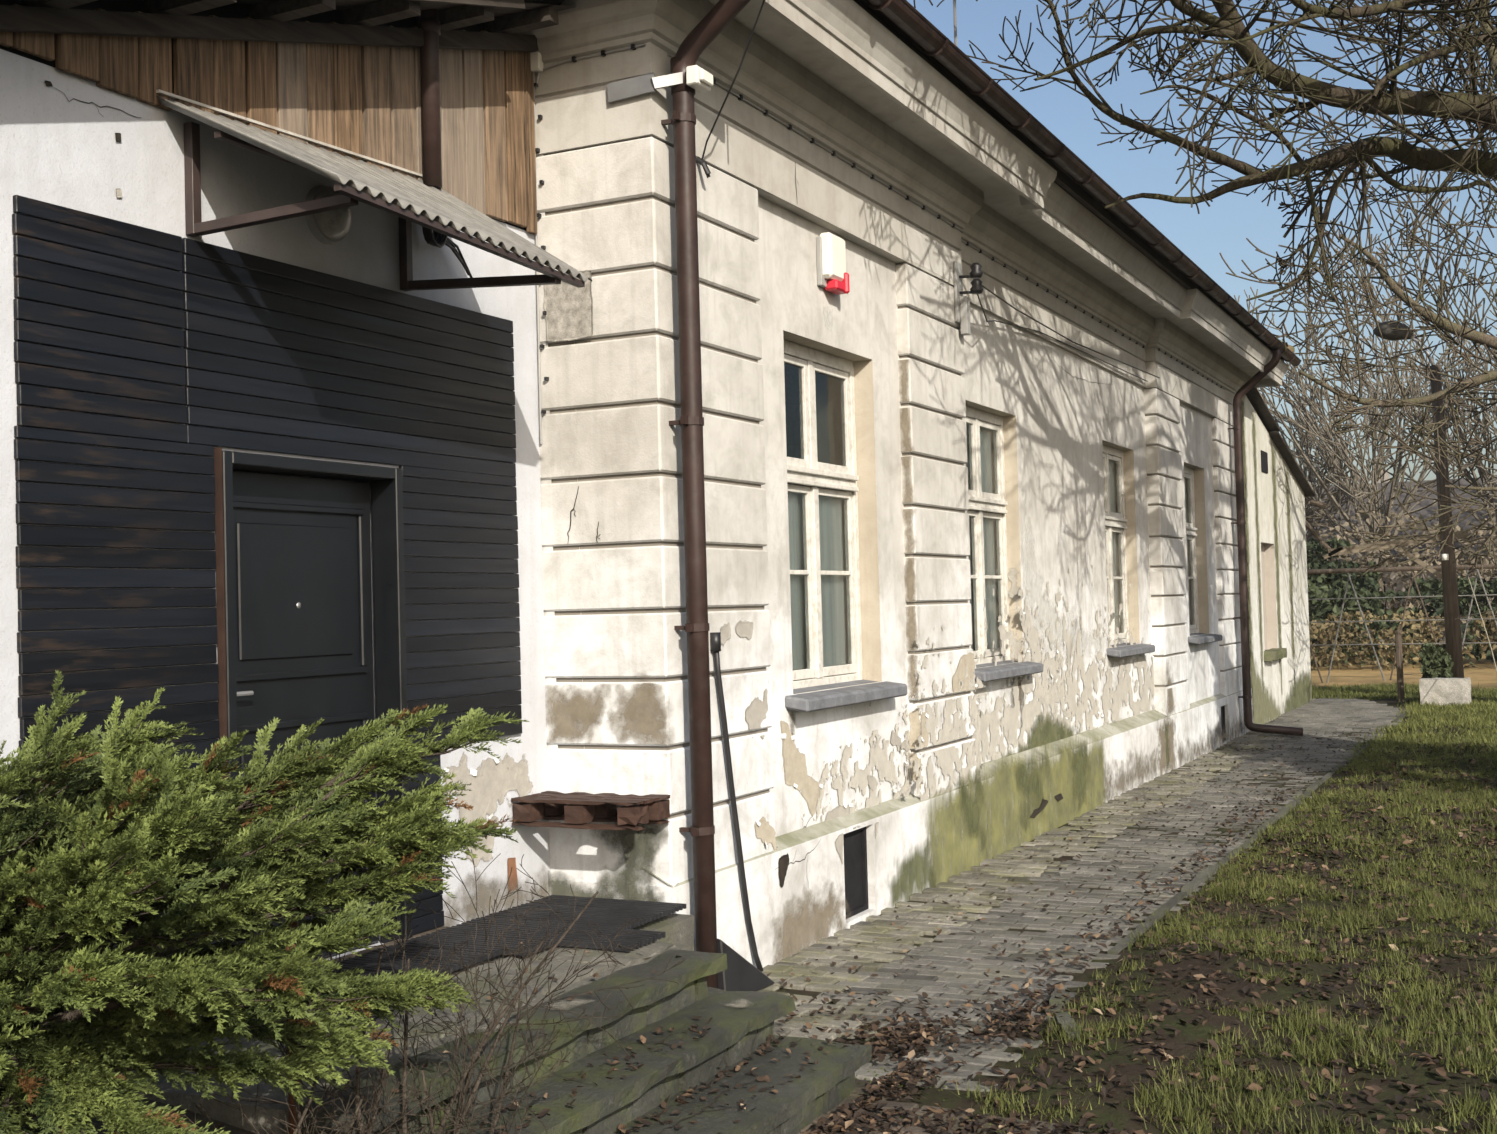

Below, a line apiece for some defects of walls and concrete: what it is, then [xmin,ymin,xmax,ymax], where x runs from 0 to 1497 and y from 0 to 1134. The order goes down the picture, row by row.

crack [54,87,141,118]
crack [567,486,600,543]
peeling [745,565,1155,864]
peeling [444,753,533,891]